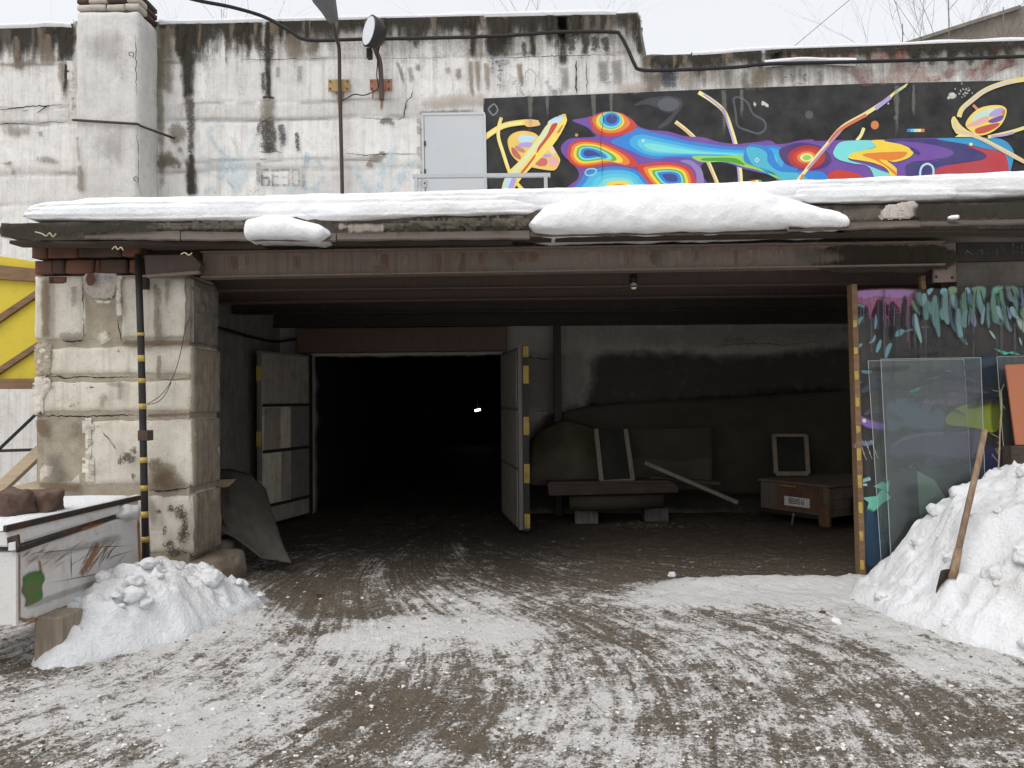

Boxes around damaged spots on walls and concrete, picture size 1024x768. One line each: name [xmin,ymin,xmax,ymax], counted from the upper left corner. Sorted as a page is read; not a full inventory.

leakage [0,26,77,93]
crack [0,104,67,125]
leakage [156,13,1024,195]
spalling [81,272,122,344]
spalling [33,343,53,415]